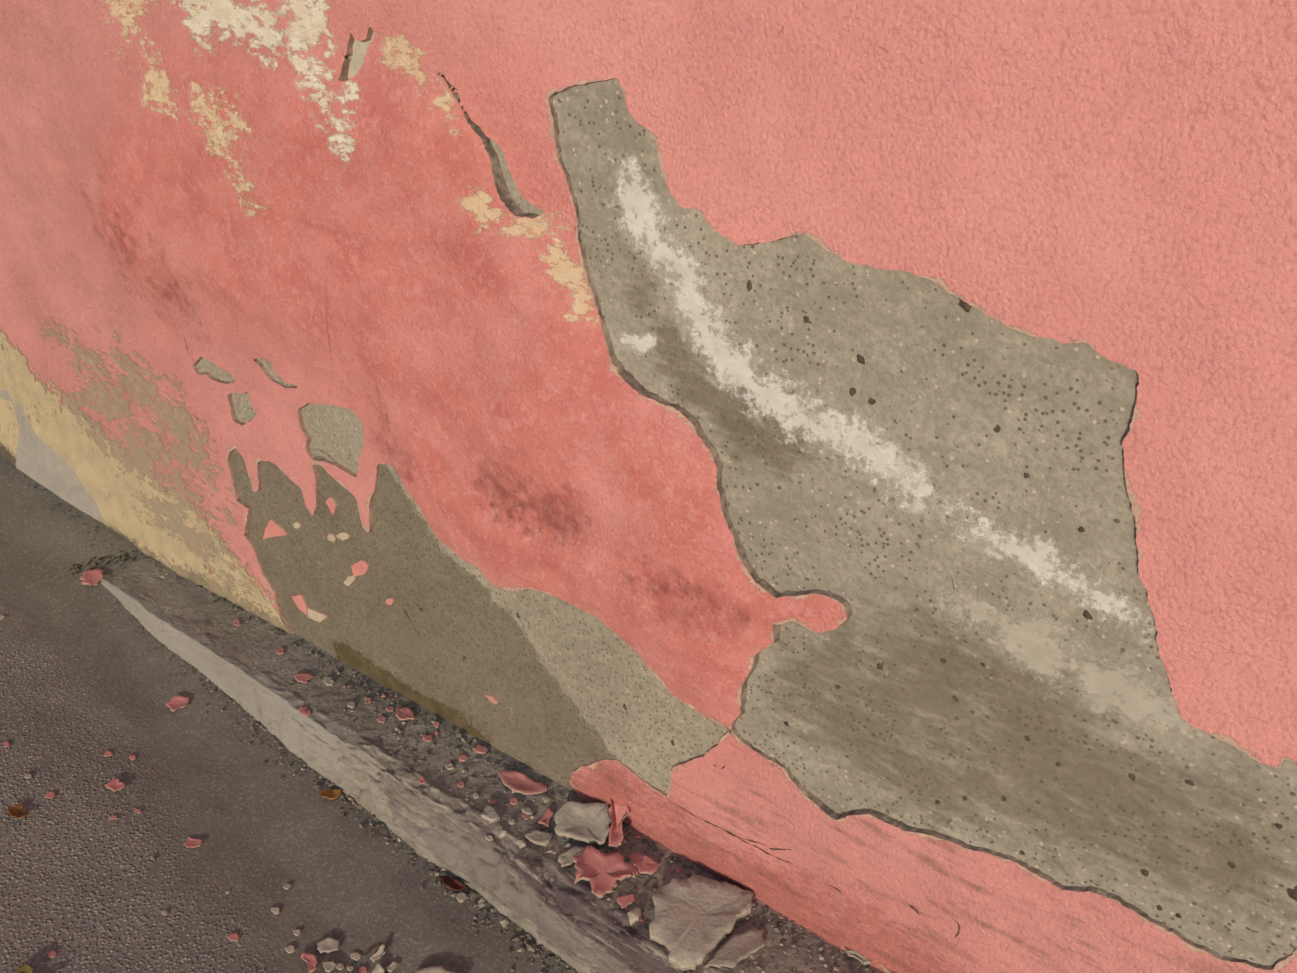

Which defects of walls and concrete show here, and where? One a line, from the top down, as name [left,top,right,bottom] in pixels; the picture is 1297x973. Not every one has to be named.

peeling [104,0,460,217]
peeling [457,191,506,233]
crack [438,72,544,218]
water stain [606,155,1154,644]
peeling [0,320,731,798]
spalling [498,78,1297,973]
water stain [938,581,1209,739]
peeling [183,837,203,848]
peeling [366,769,753,973]